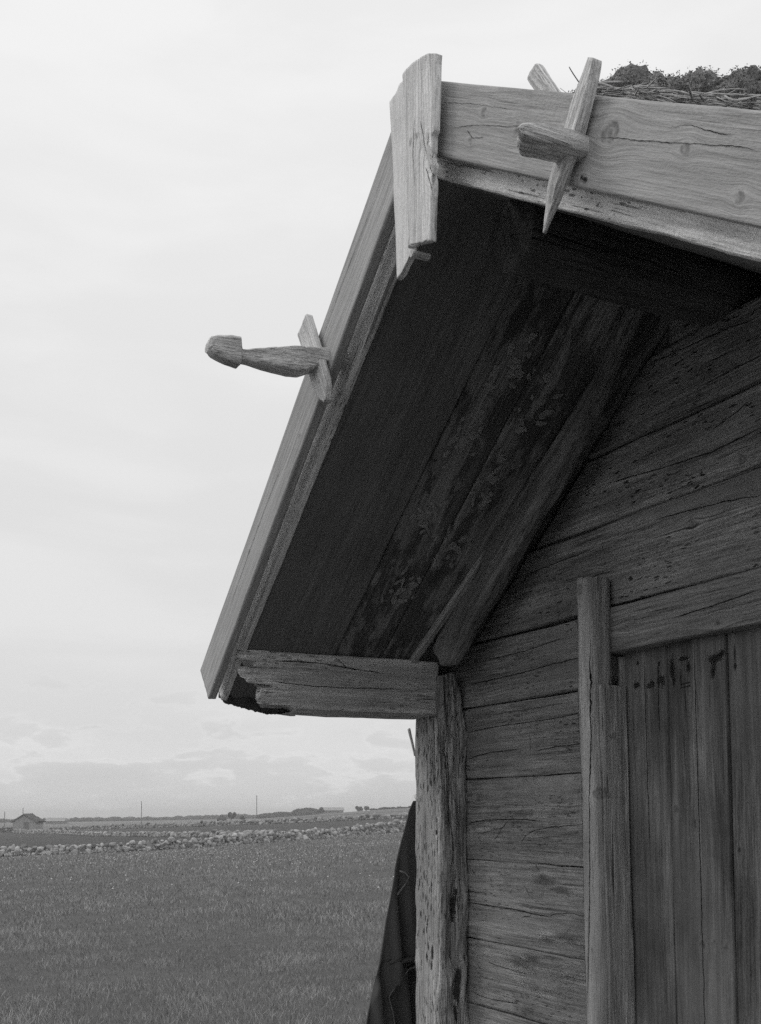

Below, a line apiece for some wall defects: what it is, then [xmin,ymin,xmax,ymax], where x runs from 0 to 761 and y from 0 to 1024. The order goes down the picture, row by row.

crack [601,125,753,150]
crack [273,659,393,690]